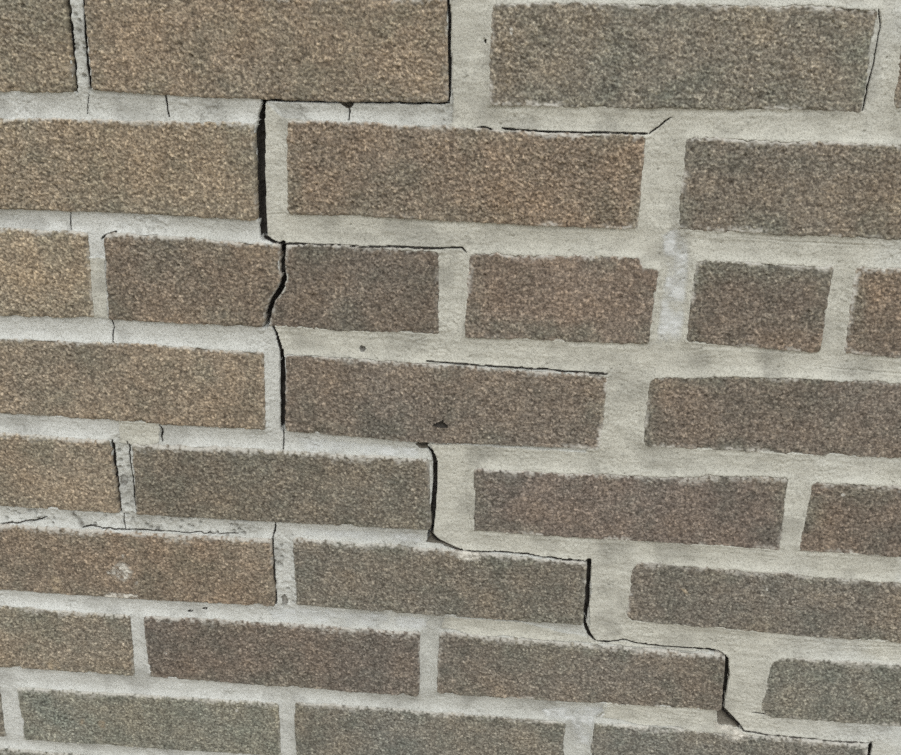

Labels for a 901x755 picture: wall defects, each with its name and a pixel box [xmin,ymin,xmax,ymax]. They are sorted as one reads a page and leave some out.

crack [862,10,881,111]
crack [485,117,671,134]
crack [257,0,466,449]
crack [427,360,607,375]
crack [3,516,46,524]
crack [83,440,245,534]
crack [270,522,278,604]
crack [428,446,872,755]